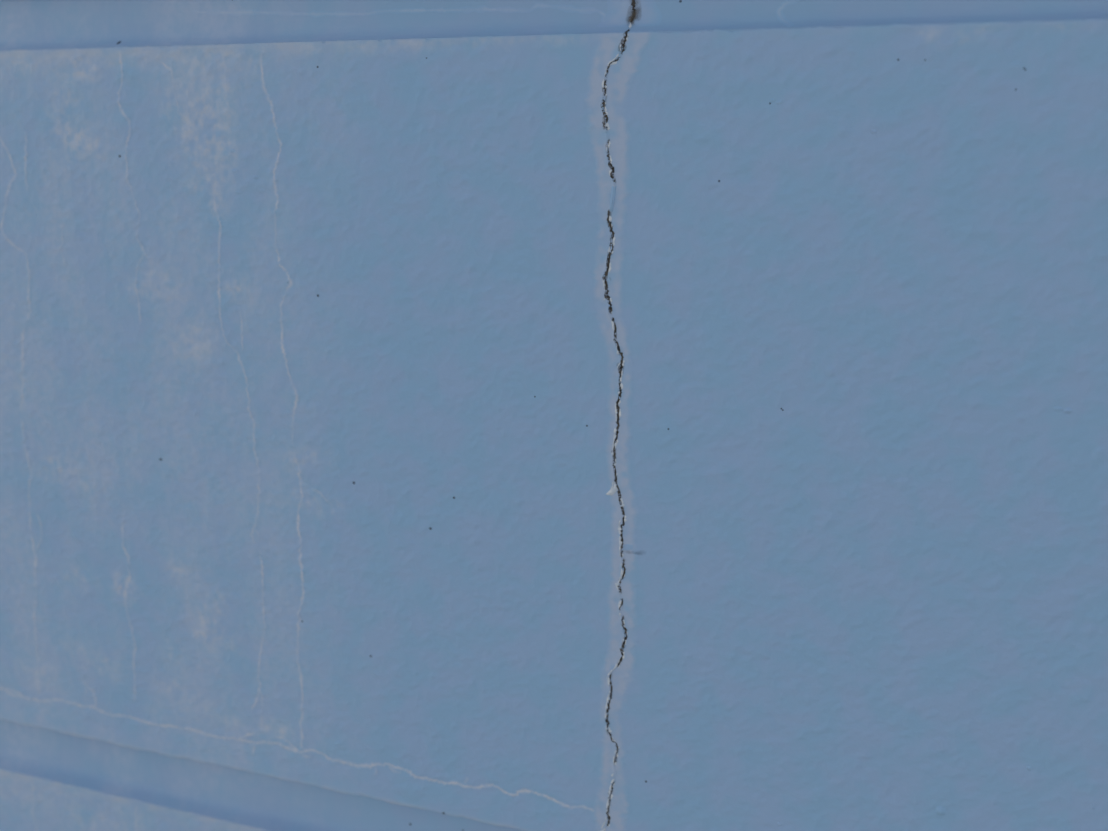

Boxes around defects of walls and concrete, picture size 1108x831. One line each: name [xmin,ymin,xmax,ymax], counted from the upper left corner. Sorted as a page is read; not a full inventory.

crack [0,0,662,831]